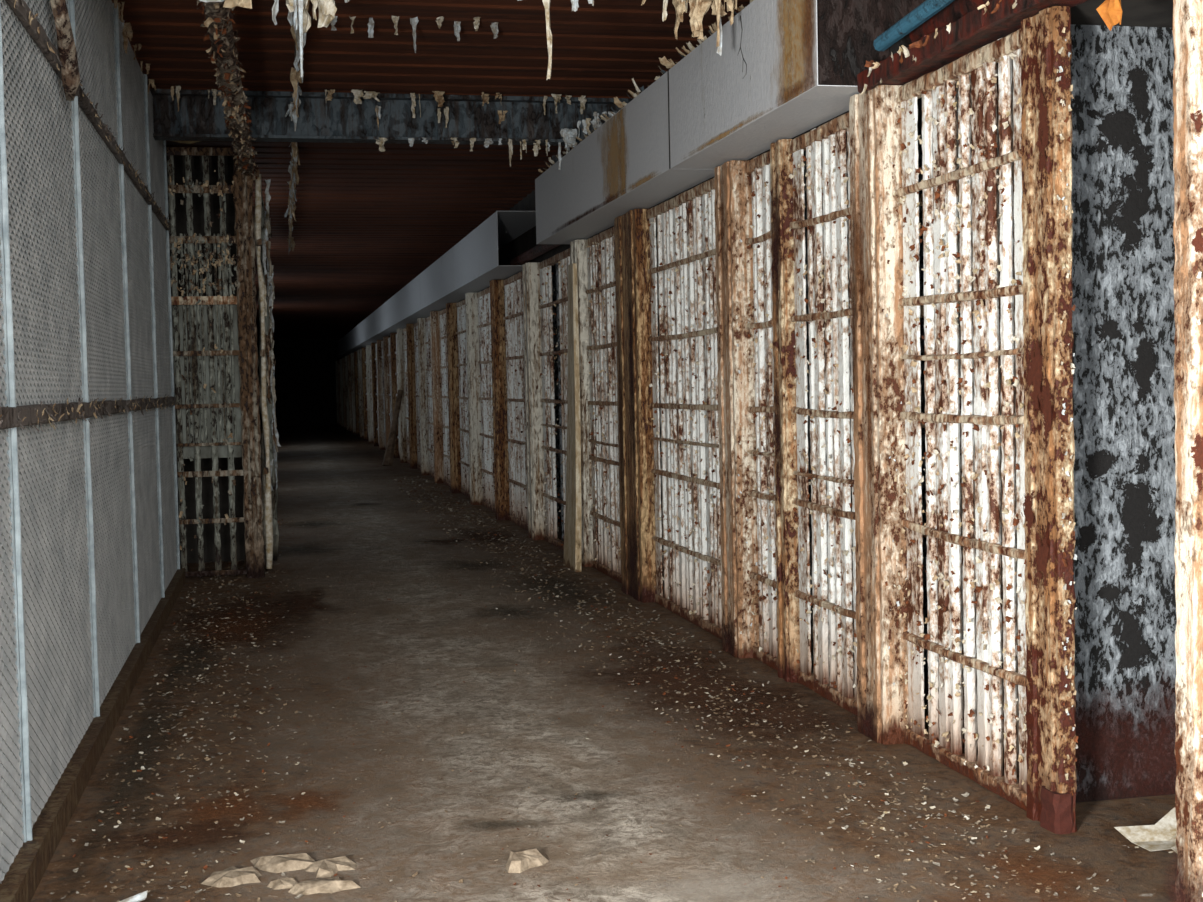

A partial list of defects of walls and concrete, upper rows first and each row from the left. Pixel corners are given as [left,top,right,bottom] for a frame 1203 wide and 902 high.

peeling [392,15,419,53]
peeling [351,89,387,152]
peeling [77,0,375,490]
corrosion [770,192,780,327]
corrosion [851,215,872,467]
corrosion [618,272,639,594]
corrosion [1075,689,1177,799]
corrosion [1168,859,1203,902]